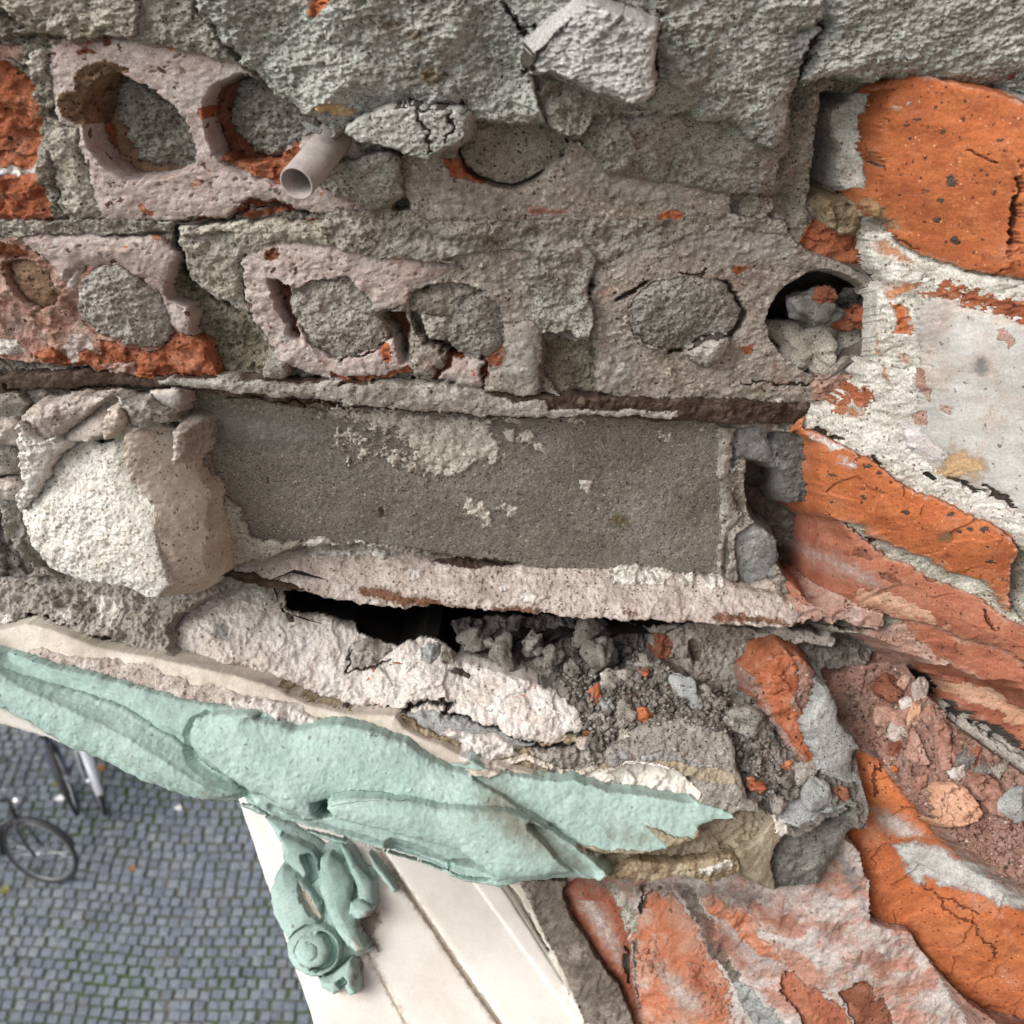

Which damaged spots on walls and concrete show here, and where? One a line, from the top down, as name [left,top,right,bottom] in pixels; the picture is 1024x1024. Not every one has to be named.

crack [501,0,537,74]
spalling [56,37,130,148]
crack [615,280,649,301]
crack [679,267,708,278]
spalling [916,278,1024,349]
spalling [33,332,225,379]
crack [668,321,738,354]
crack [745,379,811,387]
spalling [824,381,875,415]
spalling [270,570,577,653]
spalling [593,617,690,661]
peeling [465,710,789,890]